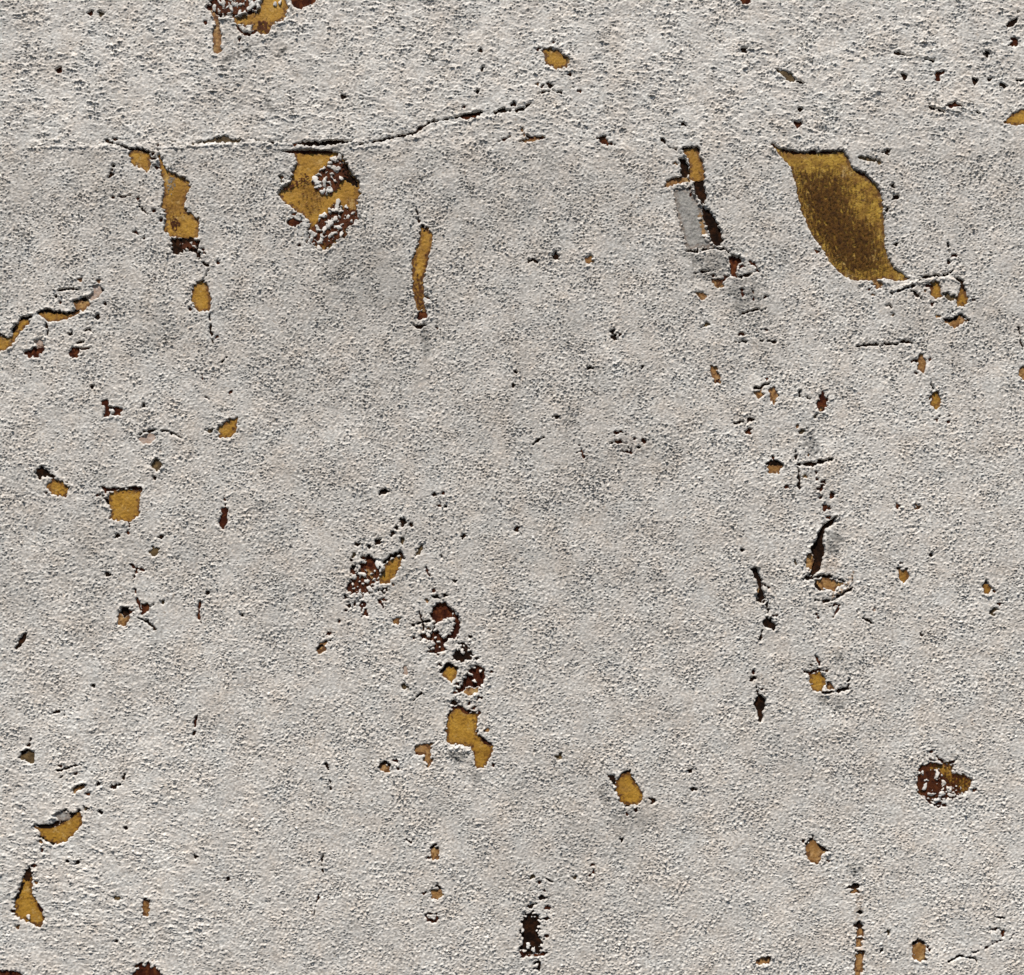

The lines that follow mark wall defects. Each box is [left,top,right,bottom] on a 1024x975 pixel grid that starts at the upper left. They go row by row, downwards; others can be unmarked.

peeling [203,0,316,54]
crack [192,82,582,147]
peeling [0,278,107,351]
peeling [105,138,220,344]
peeling [278,143,362,251]
peeling [411,209,438,329]
peeling [771,144,909,296]
crack [784,425,854,603]
peeling [317,518,423,654]
peeling [412,567,495,769]
peeling [916,750,977,808]
peeling [11,864,45,930]